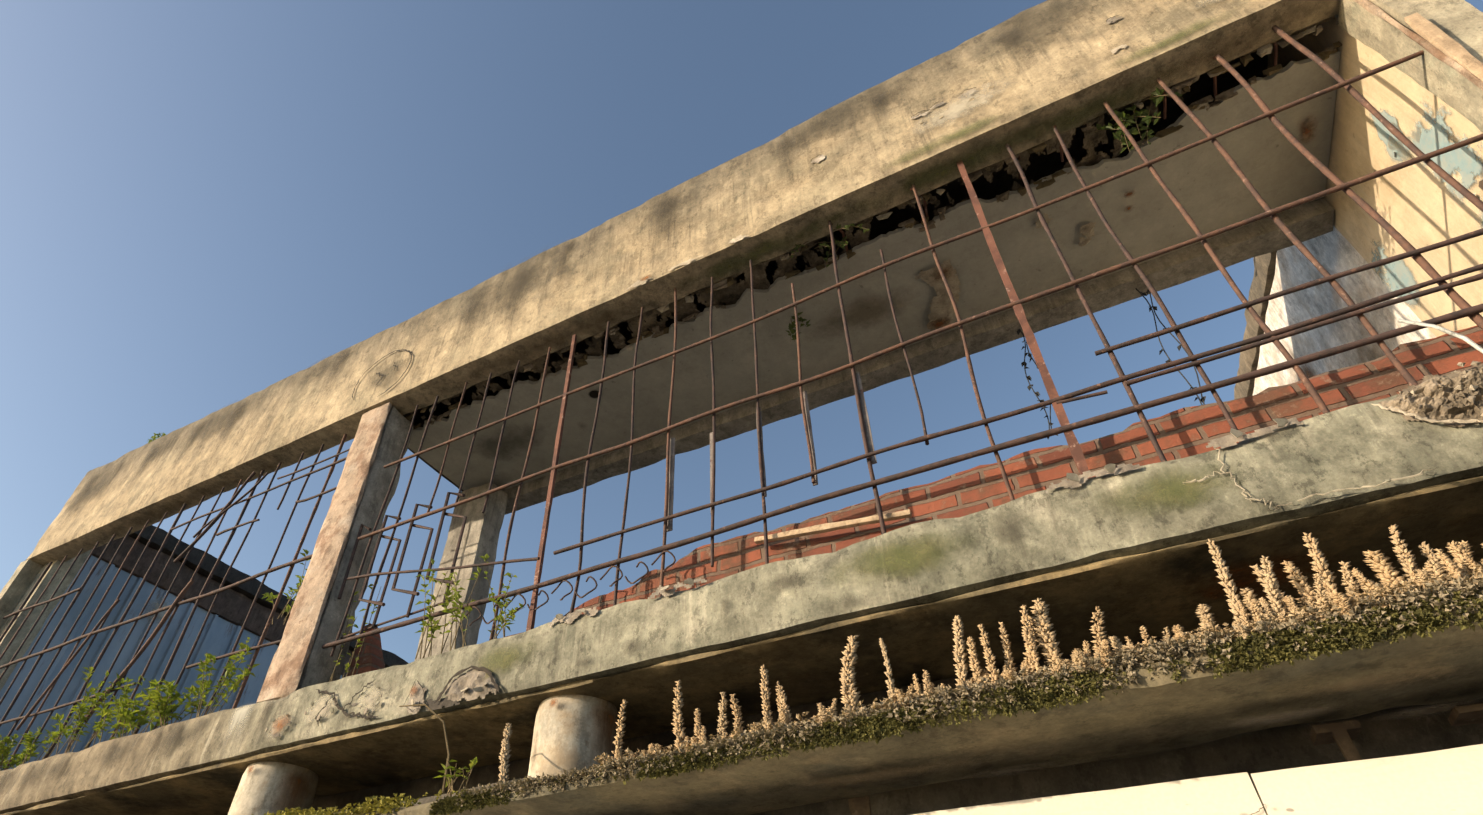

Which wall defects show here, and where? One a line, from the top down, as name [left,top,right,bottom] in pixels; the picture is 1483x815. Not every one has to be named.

spalling [910,86,995,124]
peeling [1370,104,1483,199]
flaking render [876,189,946,232]
flaking render [995,165,1078,203]
peeling [1371,241,1419,305]
flaking render [523,278,735,379]
spalling [1372,361,1483,427]
crack [1183,447,1280,511]